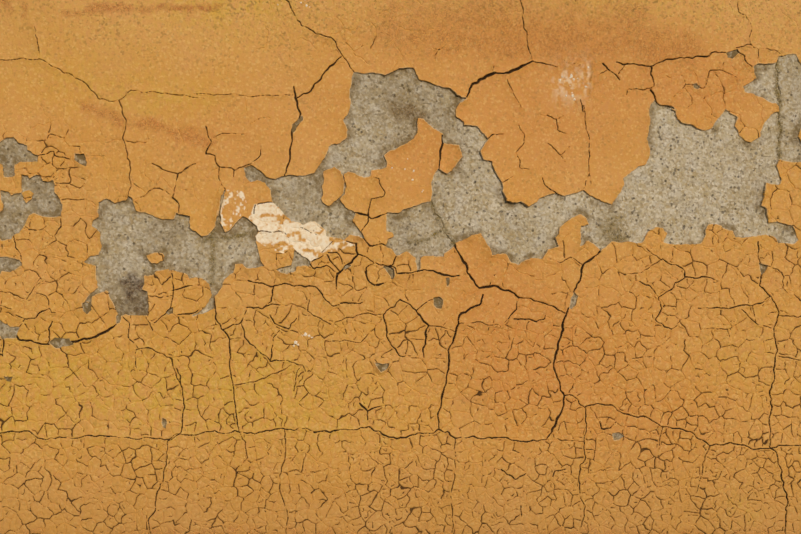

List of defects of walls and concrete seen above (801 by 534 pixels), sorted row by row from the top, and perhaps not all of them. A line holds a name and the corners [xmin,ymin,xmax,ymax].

crack [466,0,575,107]
peeling [0,137,62,240]
peeling [74,154,87,166]
crack [0,0,376,212]
peeling [82,54,801,324]
crack [580,99,591,189]
crack [600,3,801,230]
peeling [0,257,22,273]
peeling [0,320,19,339]
peeling [49,338,73,348]
crack [0,126,801,534]